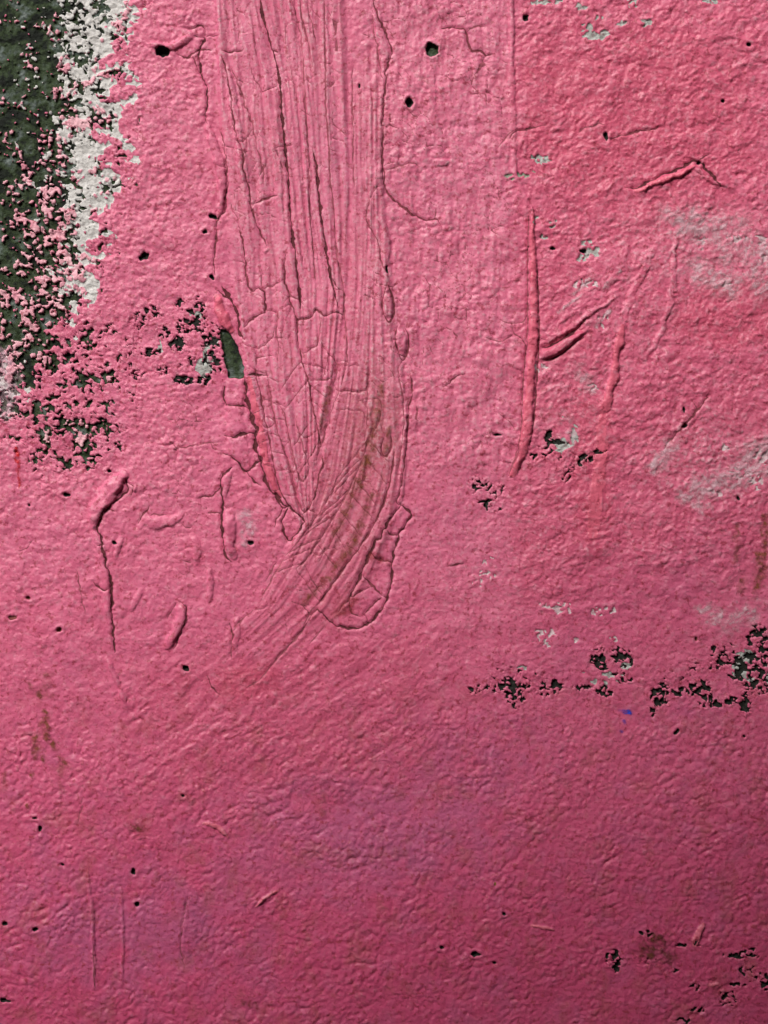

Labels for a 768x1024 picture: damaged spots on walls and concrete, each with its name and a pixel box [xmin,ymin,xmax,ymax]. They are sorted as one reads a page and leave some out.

peeling [0,0,234,485]
crack [76,0,586,687]
peeling [530,416,607,482]
peeling [472,479,504,511]
spalling [539,602,571,614]
peeling [468,666,562,709]
spalling [532,629,556,648]
peeling [576,636,633,697]
peeling [650,625,768,717]
peeling [605,949,622,973]
peeling [676,922,705,947]
peeling [690,948,768,1006]